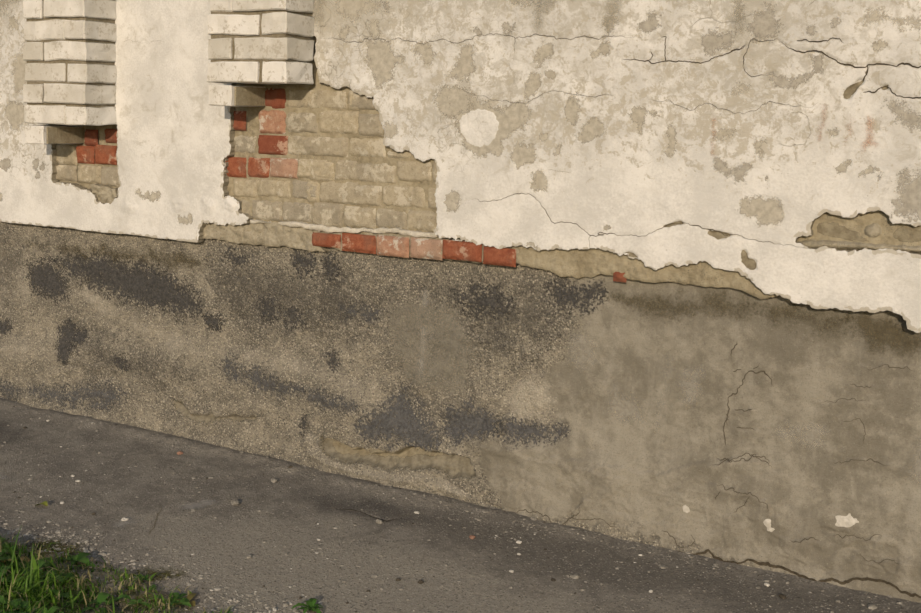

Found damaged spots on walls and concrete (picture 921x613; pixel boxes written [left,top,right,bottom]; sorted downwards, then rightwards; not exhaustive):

peeling [434,27,556,191]
spalling [46,124,120,204]
spalling [203,72,778,300]
crack [478,193,804,248]
spalling [797,168,921,253]
leakage [26,245,225,332]
leakage [290,249,340,282]
leakage [55,317,89,365]
leakage [220,350,568,453]
crack [715,344,772,512]
crack [477,500,614,527]
crack [664,531,921,598]